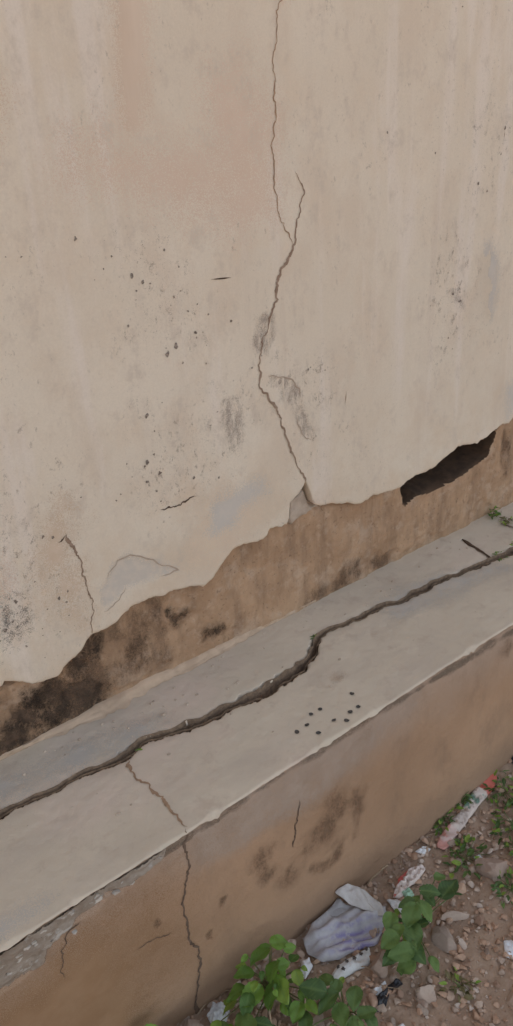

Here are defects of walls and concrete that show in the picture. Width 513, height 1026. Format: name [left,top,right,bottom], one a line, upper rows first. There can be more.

crack [258,0,306,481]
peeling [268,371,315,441]
spalling [0,849,166,988]
leakage [0,486,175,814]
leakage [120,600,188,671]
spalling [0,418,513,756]
crack [0,523,513,1014]